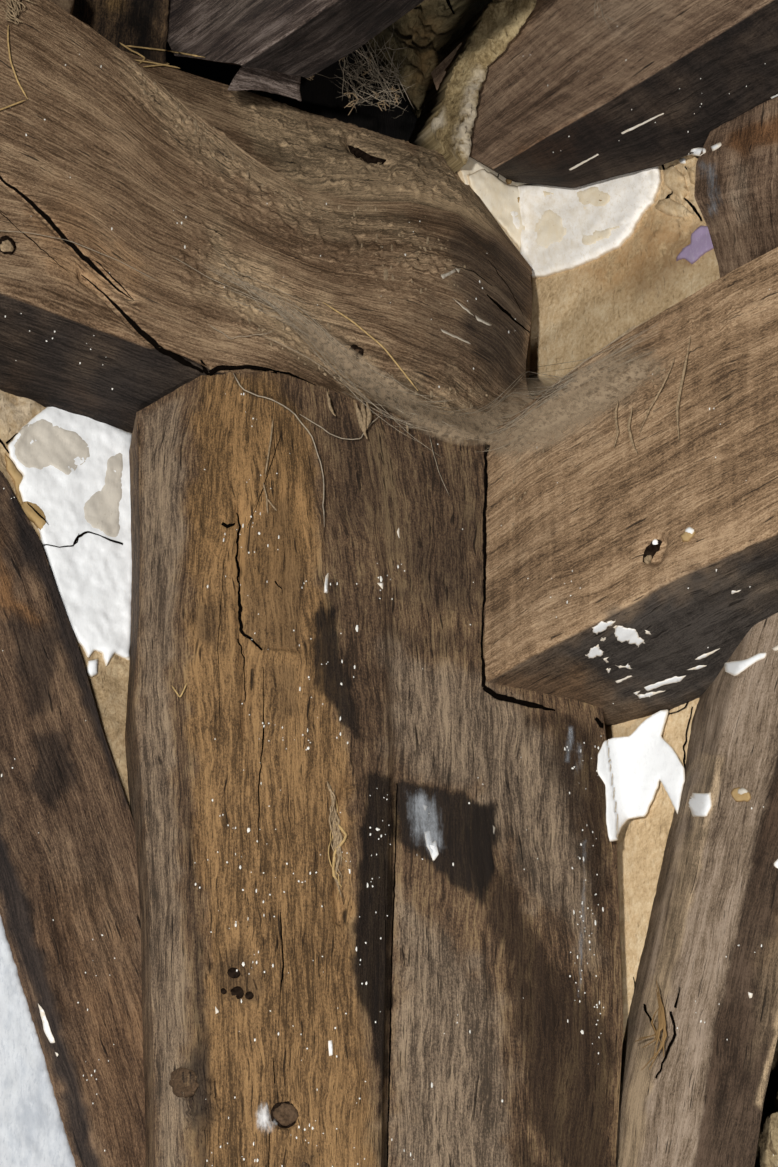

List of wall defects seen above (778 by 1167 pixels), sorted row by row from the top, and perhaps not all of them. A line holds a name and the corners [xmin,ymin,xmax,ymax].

crack [0,176,315,385]
peeling [467,166,662,278]
peeling [676,226,714,264]
peeling [8,407,132,677]
crack [42,531,123,548]
crack [217,438,280,842]
peeling [597,709,712,842]
water stain [353,773,613,1167]
crack [633,977,680,1078]